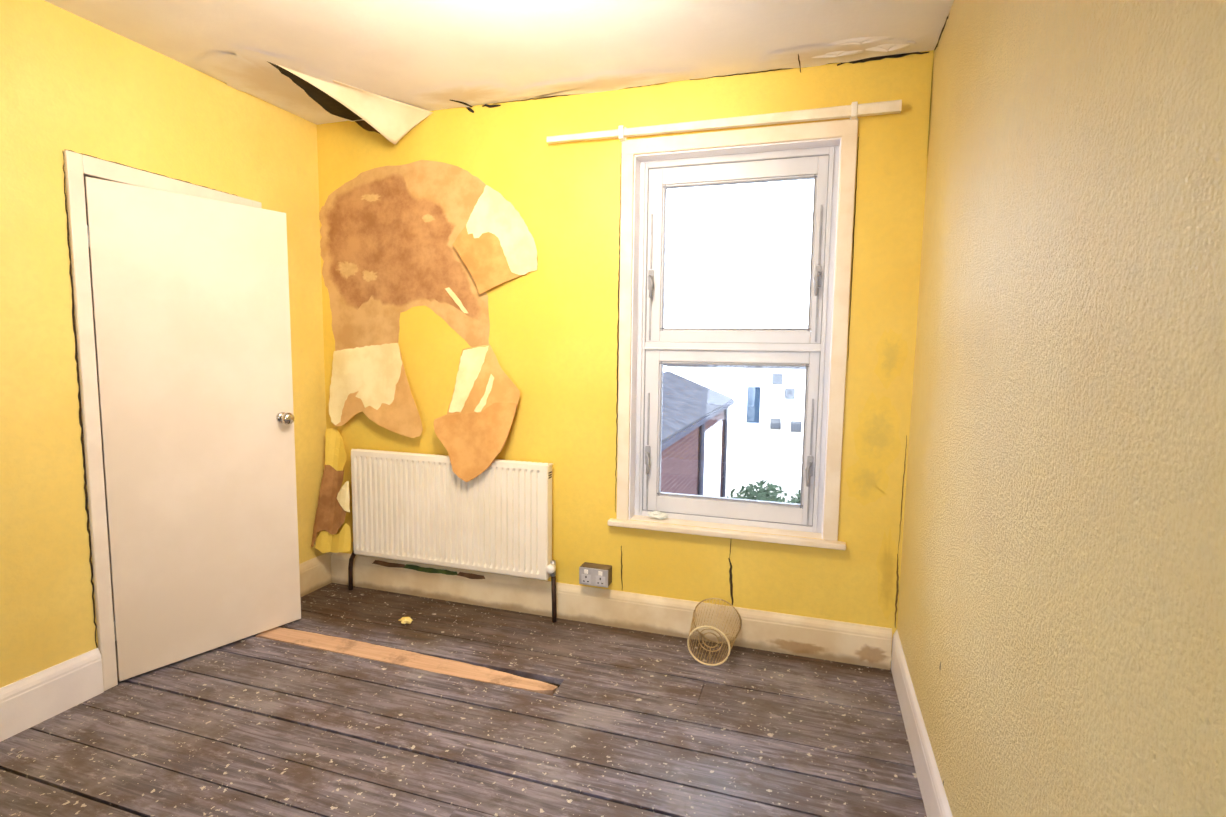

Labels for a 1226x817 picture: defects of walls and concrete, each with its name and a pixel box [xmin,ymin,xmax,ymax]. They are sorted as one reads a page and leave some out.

peeling [452,185,538,294]
peeling [311,343,520,553]
crack [727,542,735,605]